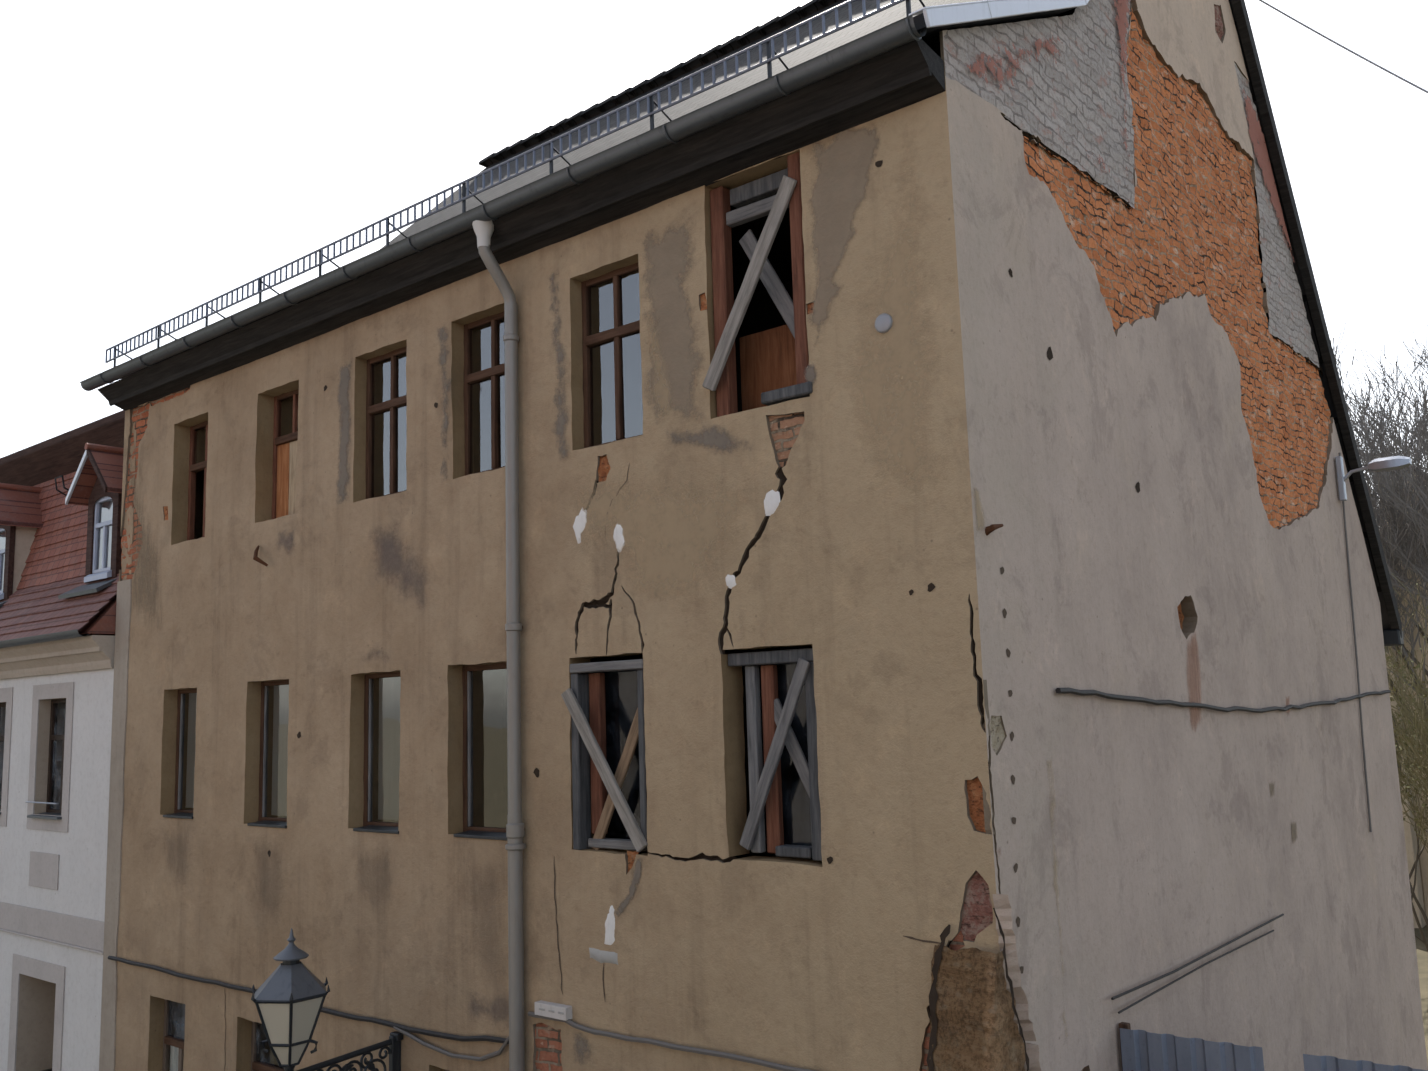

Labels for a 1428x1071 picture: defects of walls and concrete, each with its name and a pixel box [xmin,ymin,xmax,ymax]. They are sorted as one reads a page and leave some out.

spalling [943,0,1331,529]
spalling [121,387,190,580]
crack [588,463,630,530]
spalling [769,413,805,467]
crack [577,564,644,648]
crack [720,467,787,654]
crack [970,601,985,728]
crack [646,851,737,863]
flaking render [949,872,1041,1071]
spalling [535,1023,563,1071]